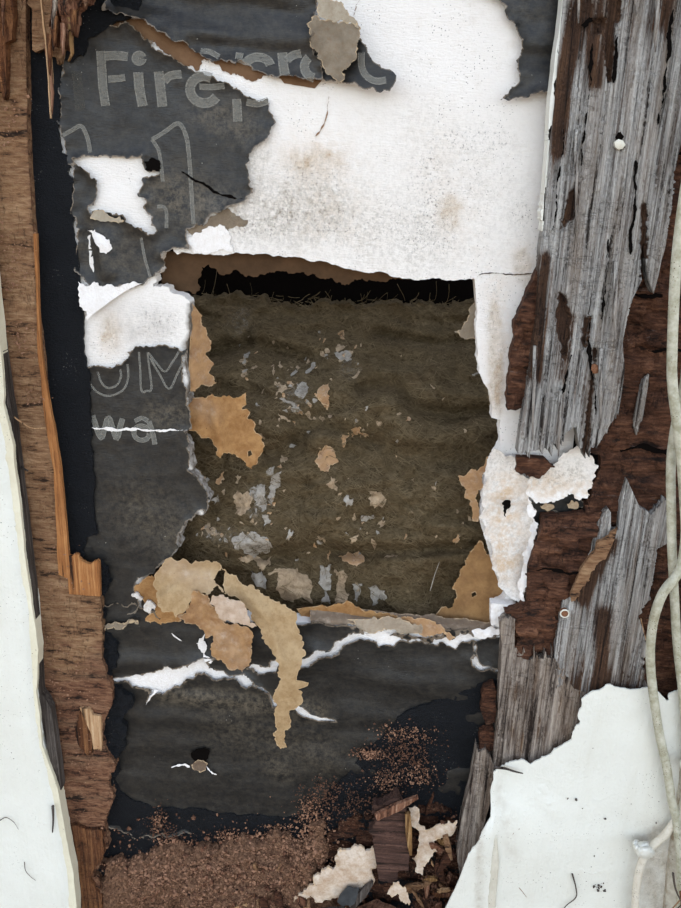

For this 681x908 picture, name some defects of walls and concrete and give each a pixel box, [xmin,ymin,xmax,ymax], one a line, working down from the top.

crack [181,171,242,199]
peeling [131,591,156,613]